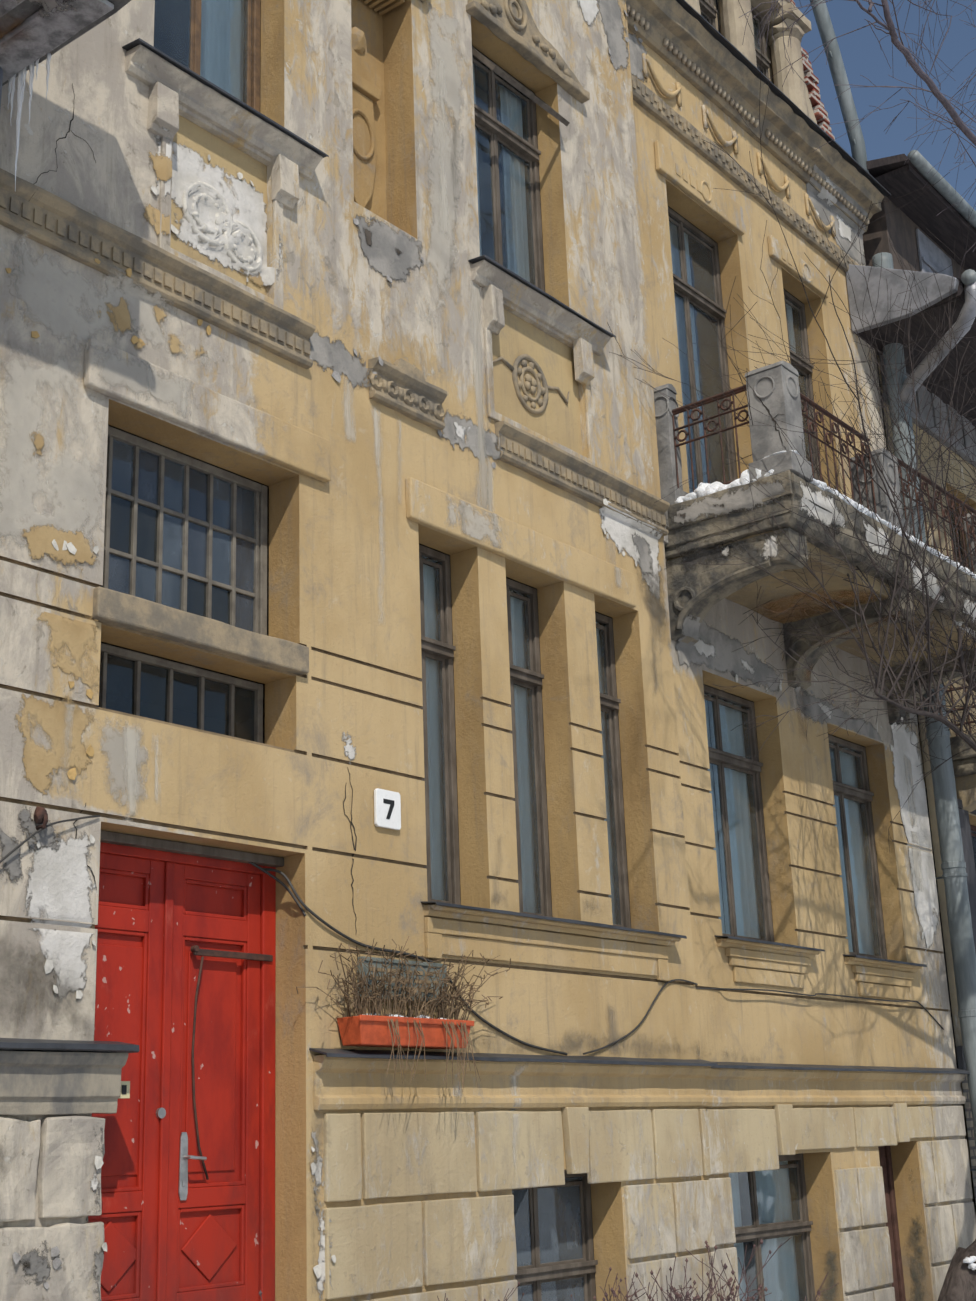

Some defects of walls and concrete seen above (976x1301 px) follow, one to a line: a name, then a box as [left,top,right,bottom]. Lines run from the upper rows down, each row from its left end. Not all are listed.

spalling [577,0,647,83]
crack [29,84,96,201]
peeling [143,127,283,287]
spalling [353,215,424,283]
peeling [0,236,211,571]
spalling [309,332,384,437]
peeling [599,479,845,598]
peeling [863,520,976,636]
peeling [15,612,100,795]
peeling [0,809,96,1003]
crack [343,767,357,932]
peeling [675,614,940,955]